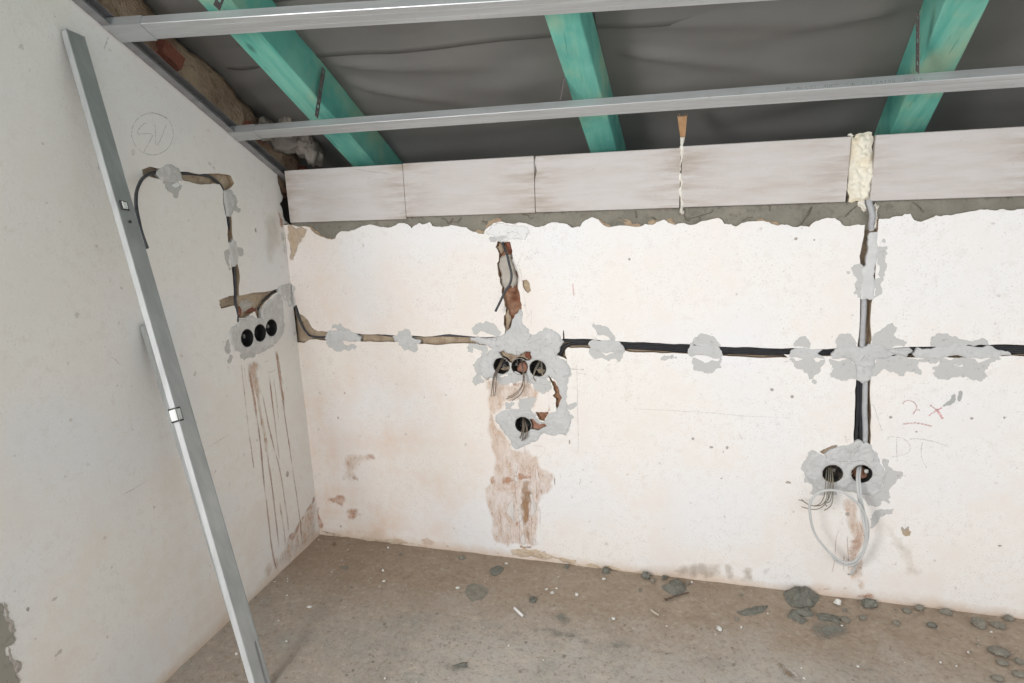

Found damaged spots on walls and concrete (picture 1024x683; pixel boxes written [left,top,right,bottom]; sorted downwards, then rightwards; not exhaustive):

flaking render [288,225,306,259]
peeling [487,223,529,242]
flaking render [0,602,22,683]